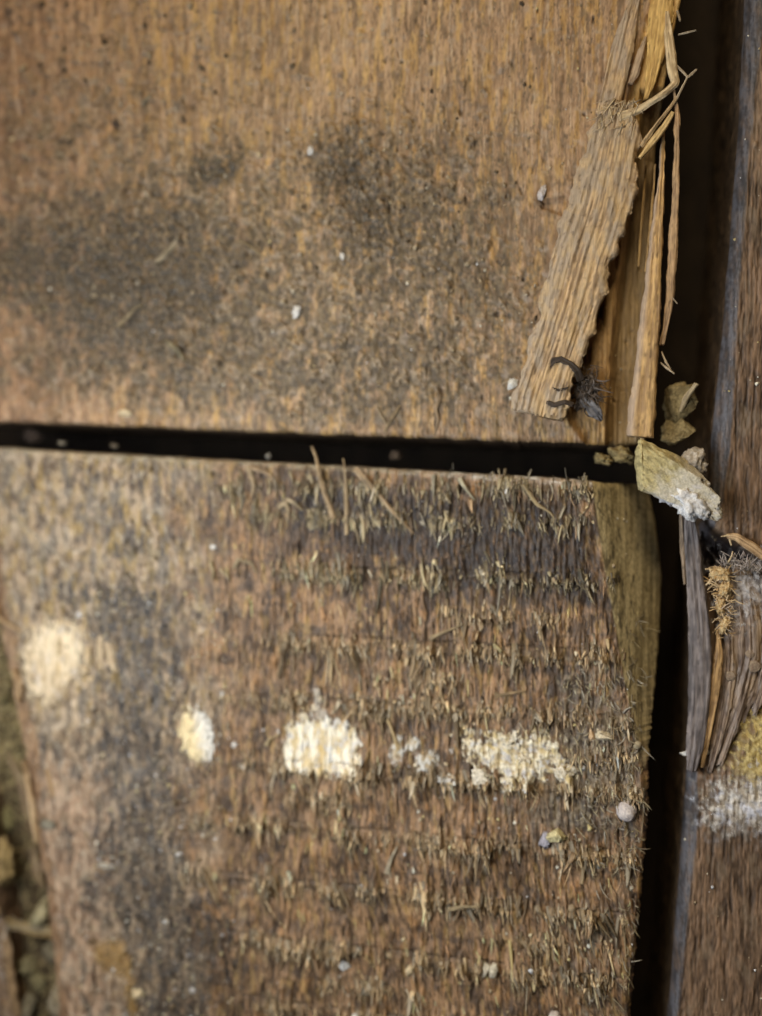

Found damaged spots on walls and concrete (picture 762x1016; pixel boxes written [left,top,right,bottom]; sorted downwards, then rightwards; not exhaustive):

damp [180,144,237,185]
damp [0,182,245,407]
damp [715,561,759,626]
damp [17,572,254,1016]
damp [276,688,363,779]
damp [389,733,439,771]
damp [449,725,580,794]
damp [699,704,762,831]